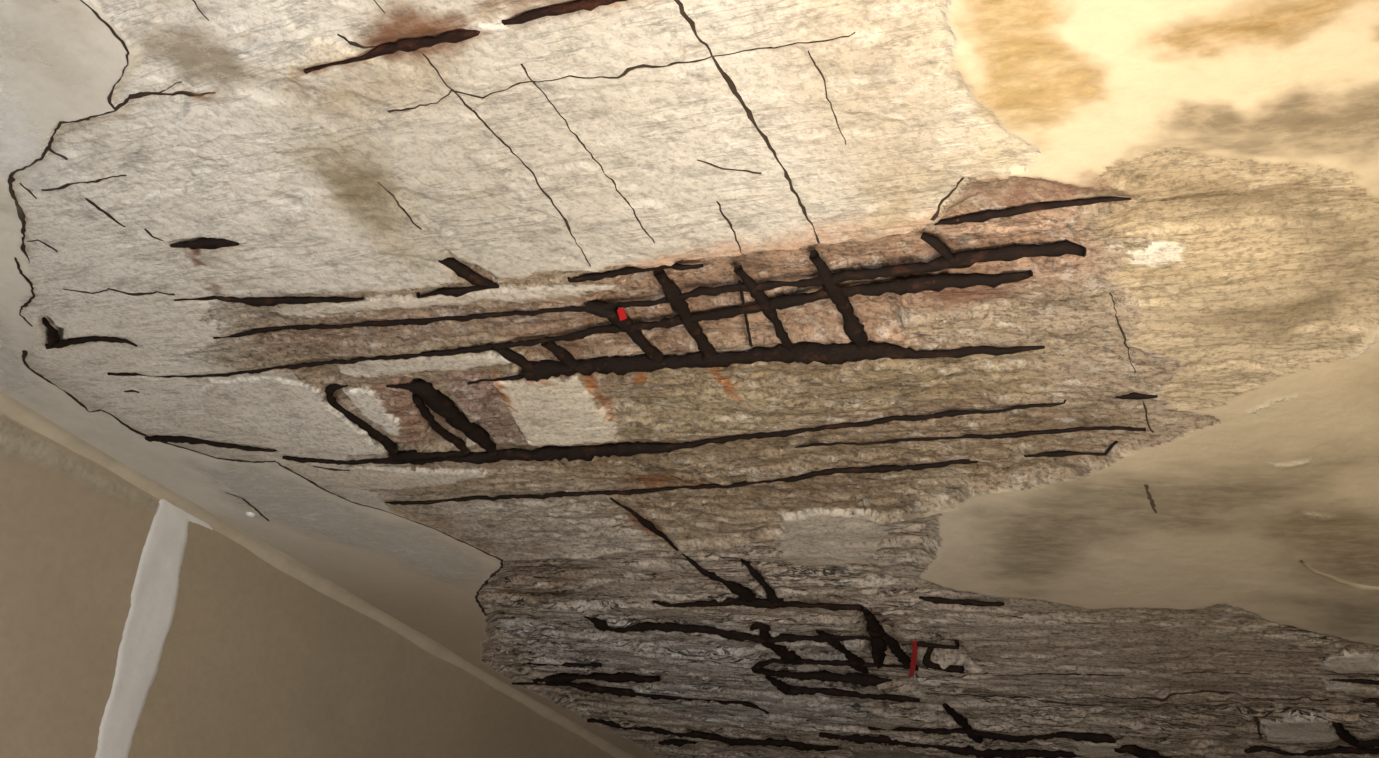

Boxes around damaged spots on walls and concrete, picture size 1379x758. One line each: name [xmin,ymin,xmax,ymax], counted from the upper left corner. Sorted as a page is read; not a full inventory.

rust [369,13,447,55]
leakage [978,0,1099,122]
leakage [1166,0,1344,49]
crack [388,0,855,267]
leakage [1179,94,1379,154]
spalling [12,0,1066,466]
spalling [196,146,1379,758]